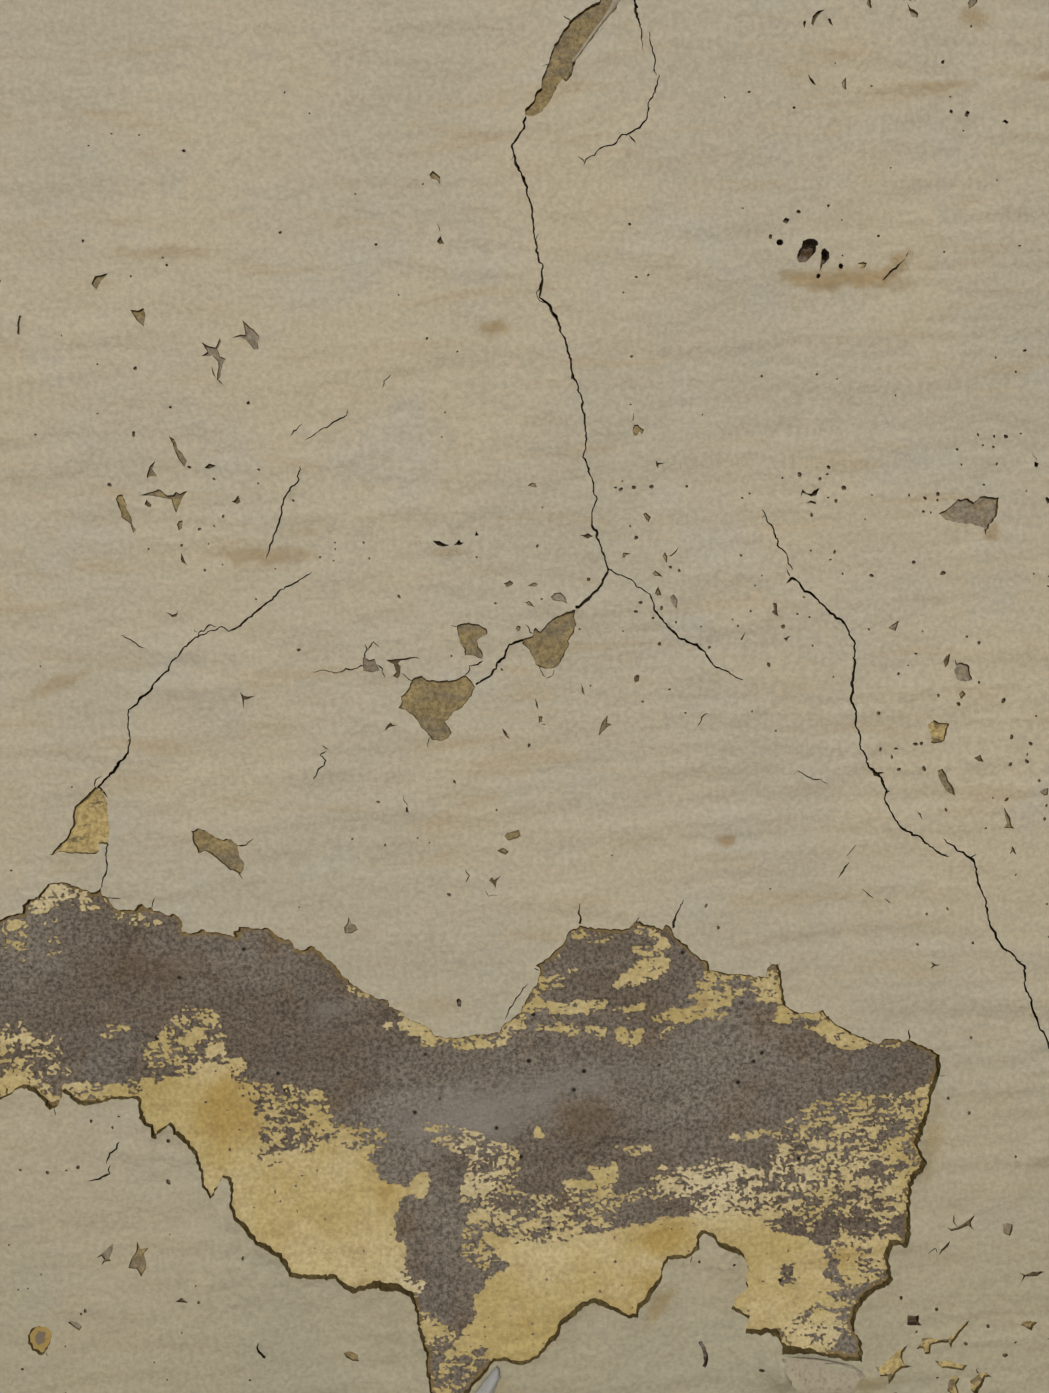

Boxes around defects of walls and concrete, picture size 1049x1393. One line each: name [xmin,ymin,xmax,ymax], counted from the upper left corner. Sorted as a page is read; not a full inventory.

peeling [525,0,620,116]
crack [578,0,660,164]
crack [511,116,743,680]
crack [266,411,348,558]
peeling [939,496,999,534]
crack [88,573,311,798]
peeling [316,622,487,746]
crack [476,639,524,685]
peeling [516,592,577,678]
crack [762,510,1049,1049]
peeling [191,828,254,879]
peeling [0,882,991,1393]